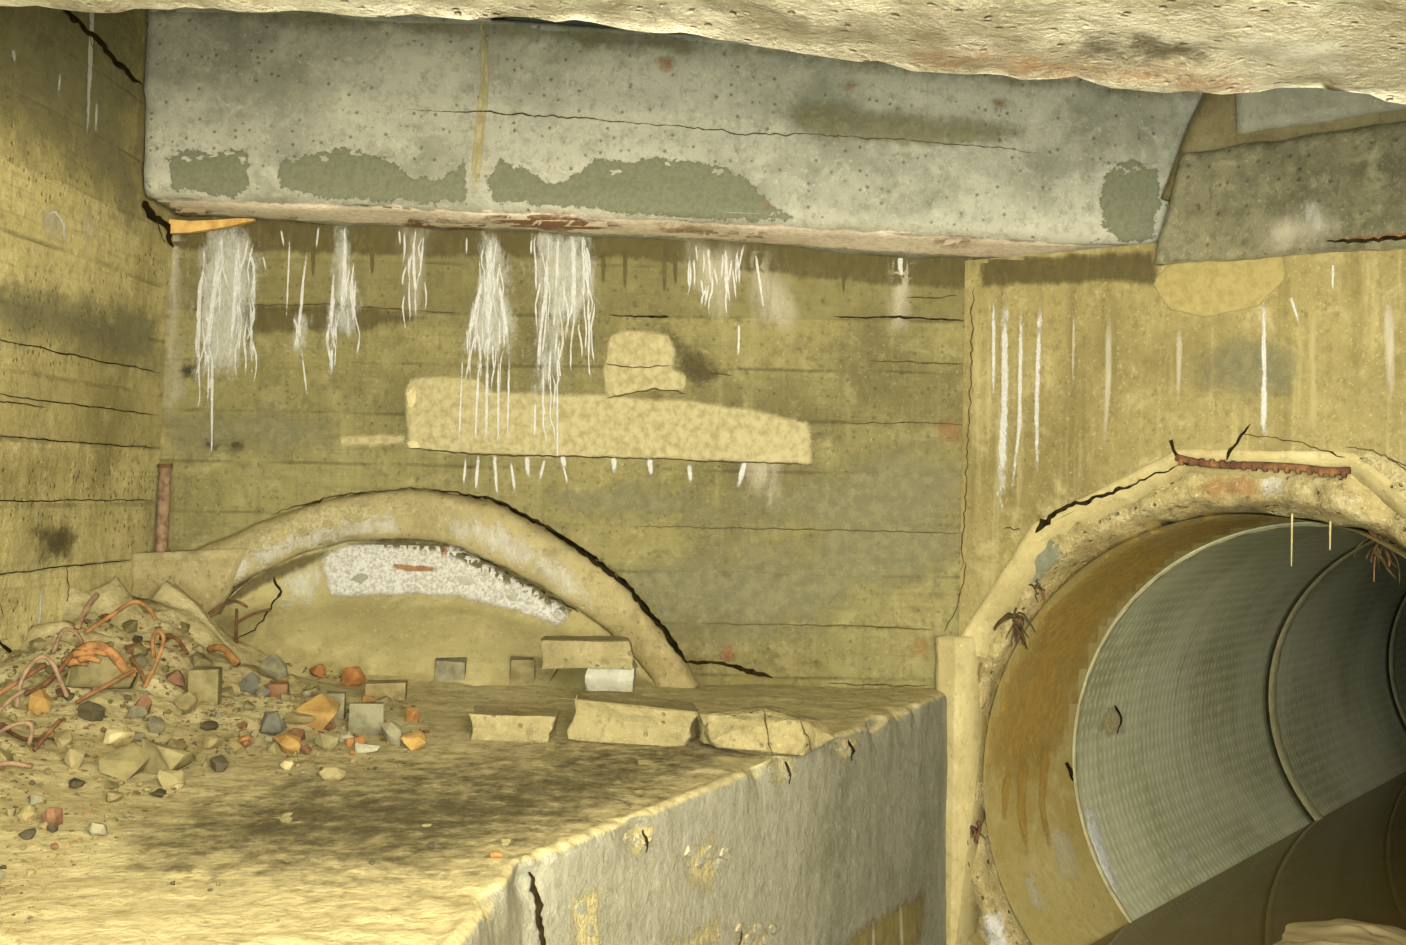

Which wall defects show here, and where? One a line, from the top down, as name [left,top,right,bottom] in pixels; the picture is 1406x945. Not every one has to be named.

crack [62,9,142,85]
peeling [166,148,251,200]
peeling [278,147,468,206]
peeling [487,156,793,223]
peeling [1099,160,1163,243]
crack [1326,233,1406,244]
leakage [158,199,1156,512]
leakage [1206,309,1294,429]
crack [273,290,975,678]
crack [1004,439,1189,533]
crack [1226,424,1406,471]
crack [528,871,546,945]